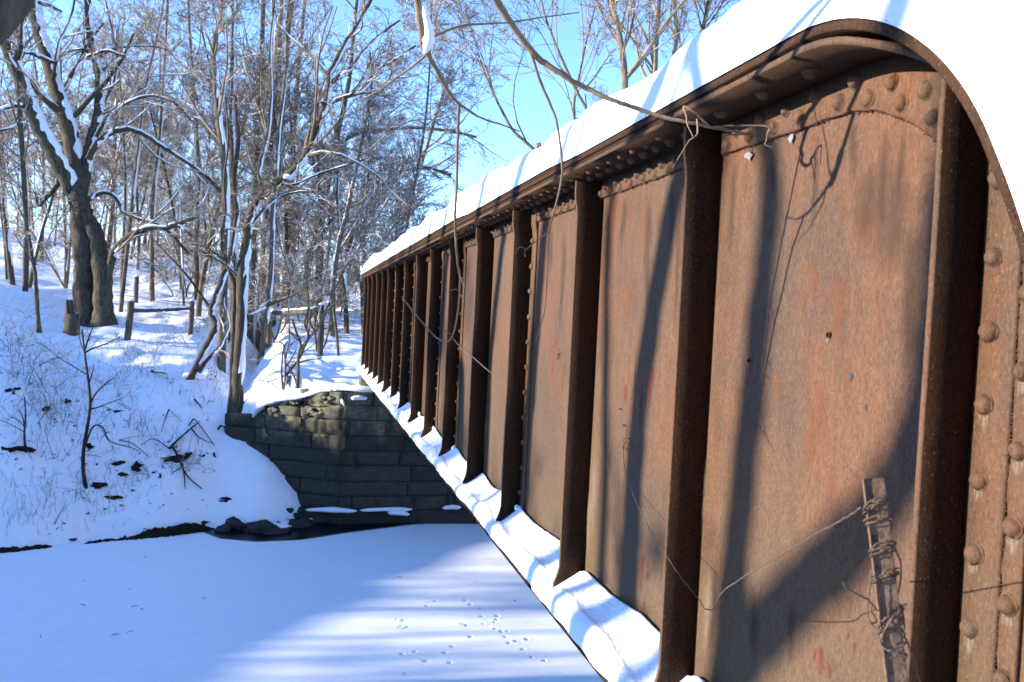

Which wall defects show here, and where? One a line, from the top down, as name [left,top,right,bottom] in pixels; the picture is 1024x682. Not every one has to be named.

corrosion [1004,256,1023,518]